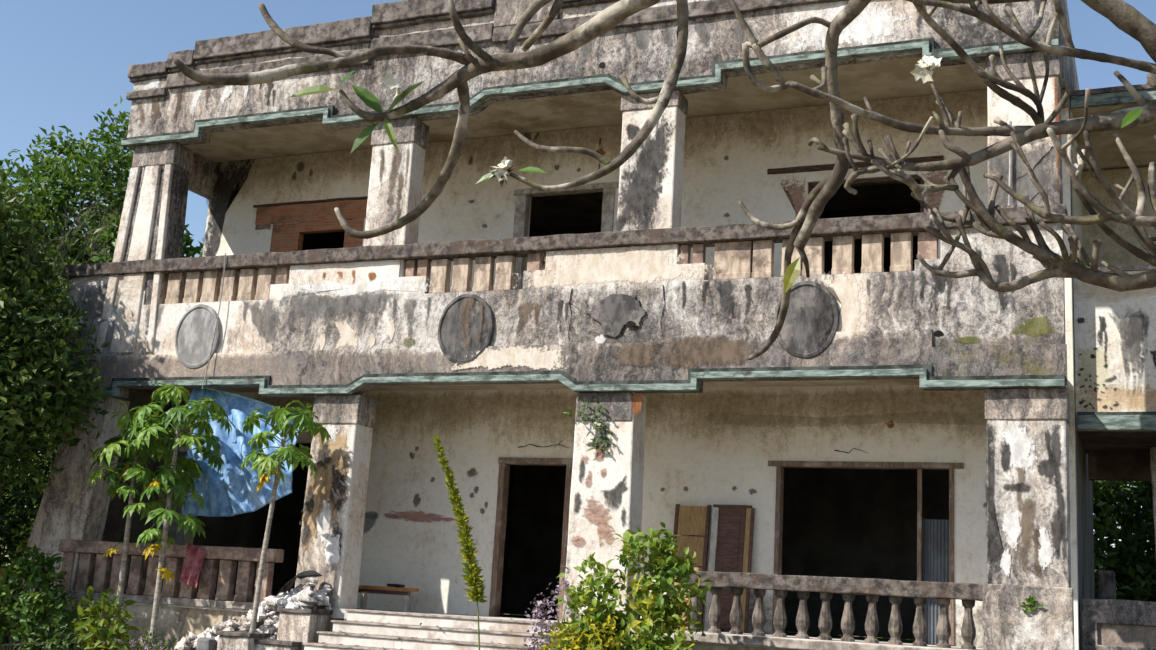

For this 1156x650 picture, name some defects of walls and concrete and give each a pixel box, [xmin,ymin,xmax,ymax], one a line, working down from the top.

damp [137,93,181,126]
damp [259,82,276,106]
damp [615,112,676,231]
damp [243,292,431,345]
damp [451,297,569,370]
damp [611,336,756,368]
damp [702,280,752,321]
damp [1077,310,1156,410]
damp [301,444,347,552]
flaking render [582,448,614,546]
damp [983,424,1066,584]
flaking render [570,536,585,546]